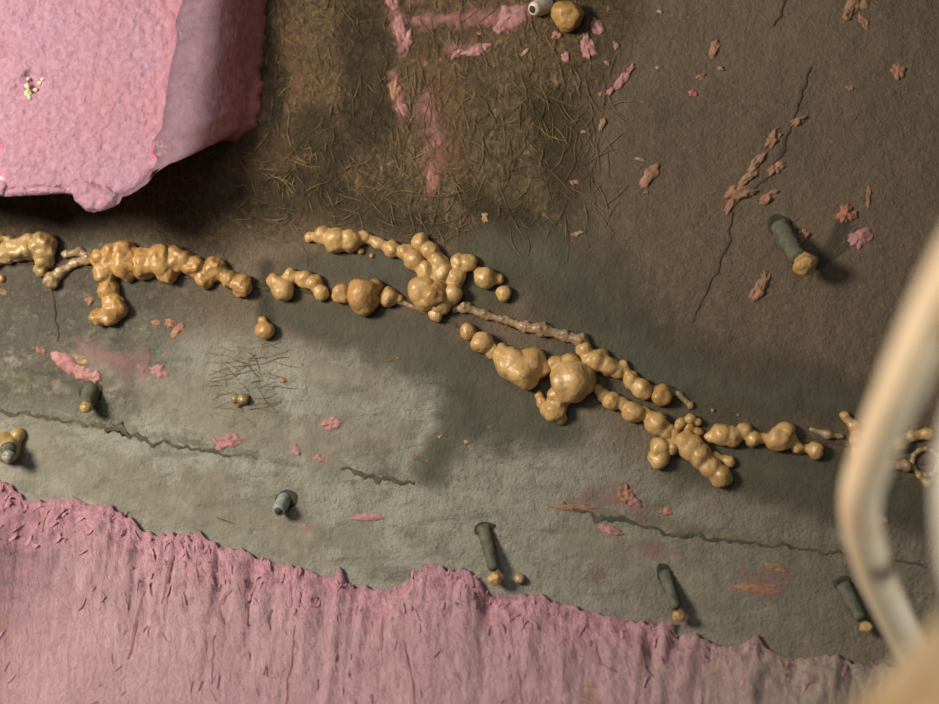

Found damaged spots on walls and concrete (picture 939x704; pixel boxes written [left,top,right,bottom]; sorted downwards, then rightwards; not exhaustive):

crack [692,67,811,322]
crack [294,286,332,294]
leakage [292,249,417,289]
leakage [456,231,874,420]
leakage [263,298,578,482]
crack [0,409,257,459]
crack [340,466,414,485]
leakage [669,452,705,479]
leakage [700,428,846,518]
peeling [598,523,625,536]
crack [564,502,850,558]
leakage [881,485,936,531]